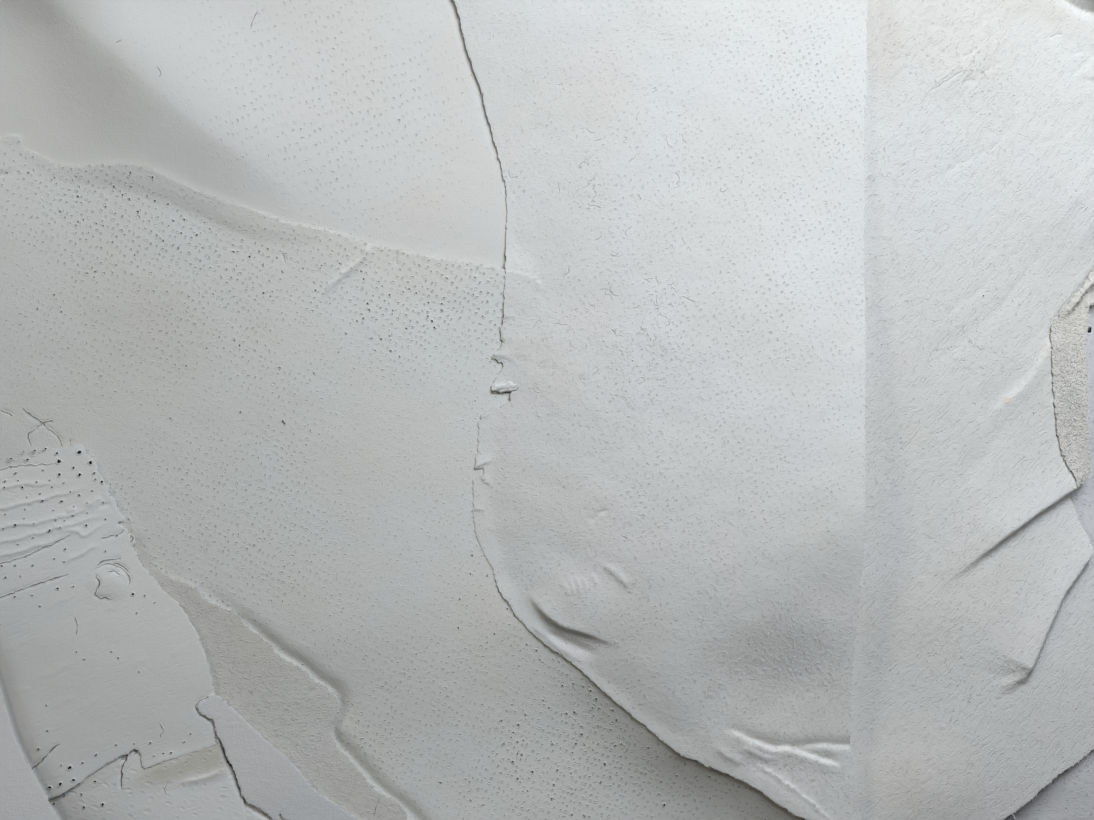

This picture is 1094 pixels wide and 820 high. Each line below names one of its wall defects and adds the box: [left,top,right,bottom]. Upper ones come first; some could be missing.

peeling [113,734,232,794]